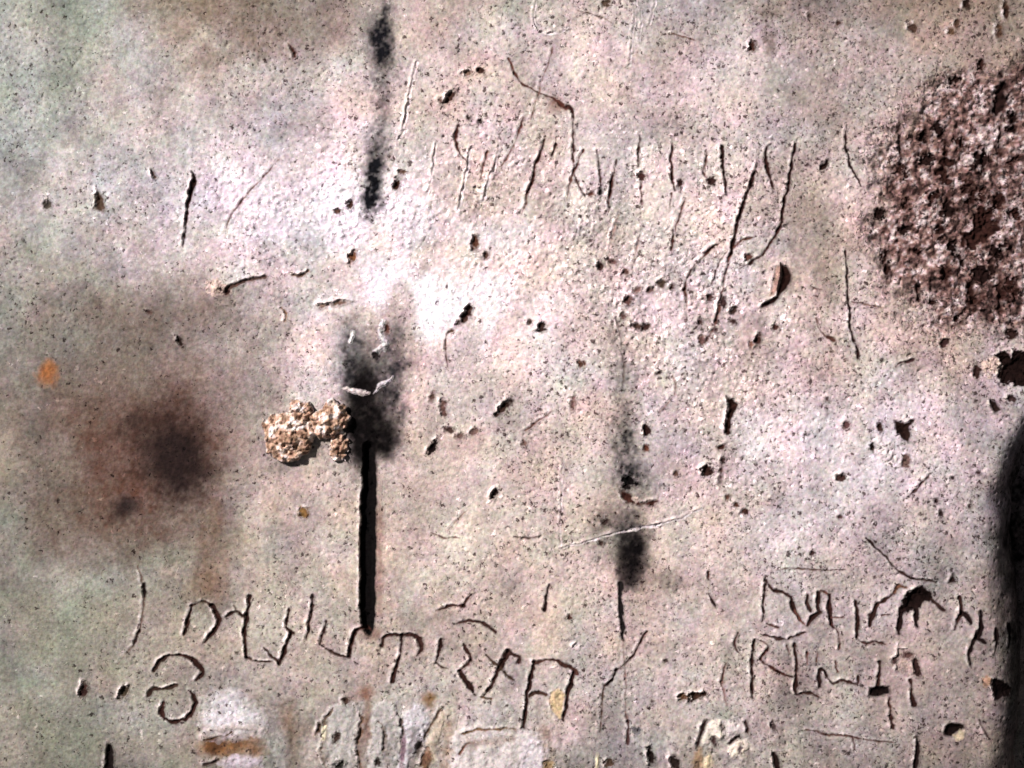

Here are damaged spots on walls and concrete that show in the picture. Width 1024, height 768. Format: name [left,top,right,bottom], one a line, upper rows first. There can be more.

spalling [851,44,1024,414]
damp [3,273,276,768]
crack [358,440,379,638]